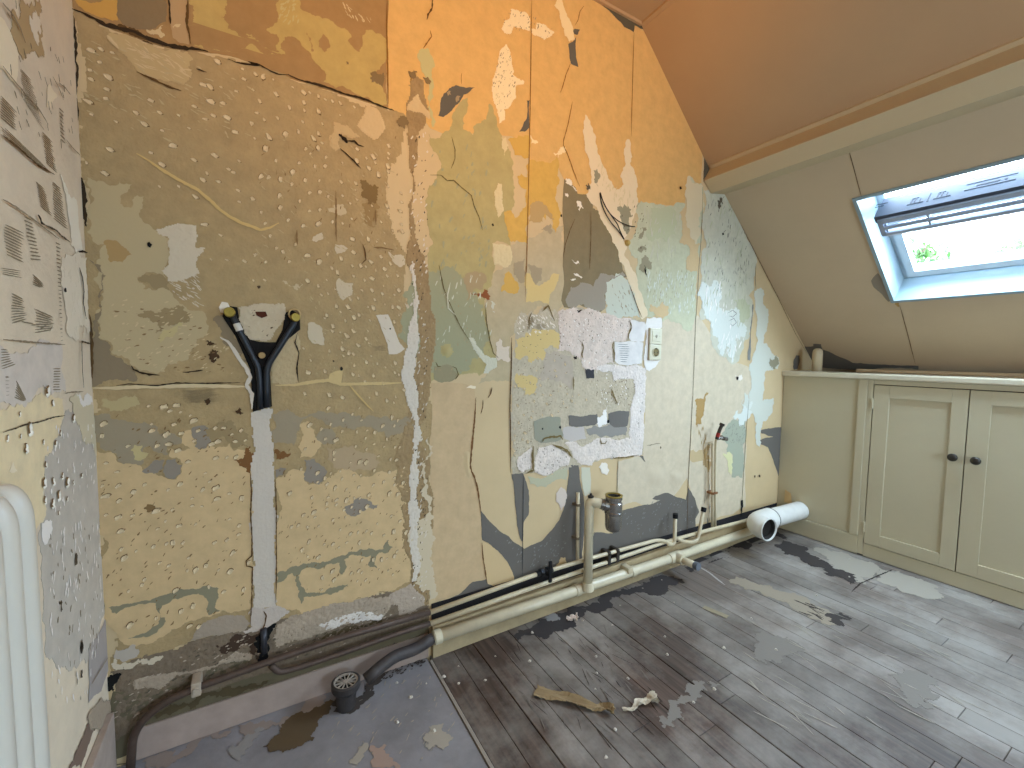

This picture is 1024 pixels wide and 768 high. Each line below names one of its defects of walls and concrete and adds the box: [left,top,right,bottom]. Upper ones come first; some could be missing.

flaking render [0,0,45,84]
flaking render [108,24,193,85]
crack [53,0,394,118]
flaking render [492,0,575,123]
flaking render [329,94,430,151]
flaking render [617,205,652,273]
flaking render [60,174,209,374]
flaking render [219,302,286,341]
flaking render [271,331,301,384]
flaking render [597,407,610,427]
flaking render [482,542,514,586]
damp [273,437,777,658]